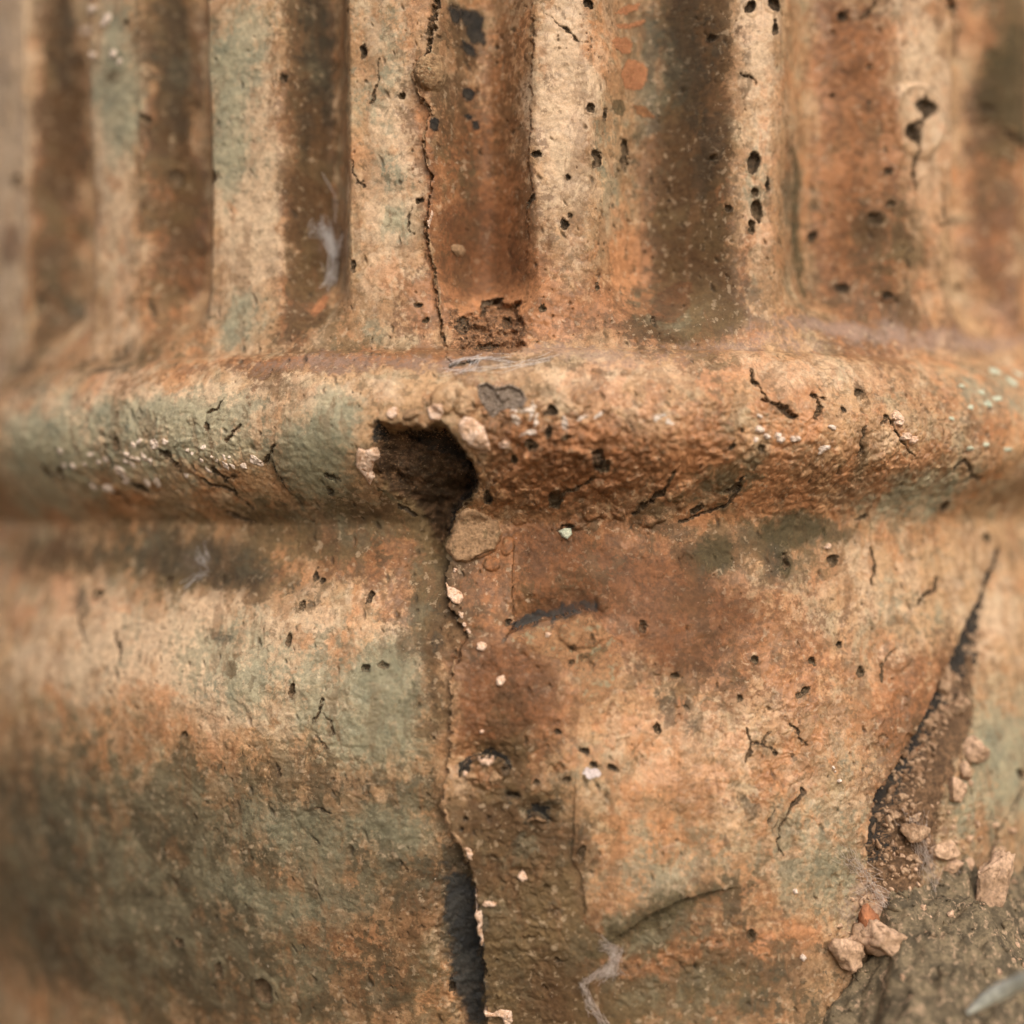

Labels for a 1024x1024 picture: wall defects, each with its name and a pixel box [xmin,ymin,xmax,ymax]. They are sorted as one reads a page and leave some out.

crack [424,0,441,56]
peeling [397,62,434,167]
crack [407,198,445,344]
spalling [413,197,528,368]
crack [749,369,825,421]
spalling [356,382,605,634]
crack [562,477,595,496]
crack [631,470,676,515]
crack [678,475,746,523]